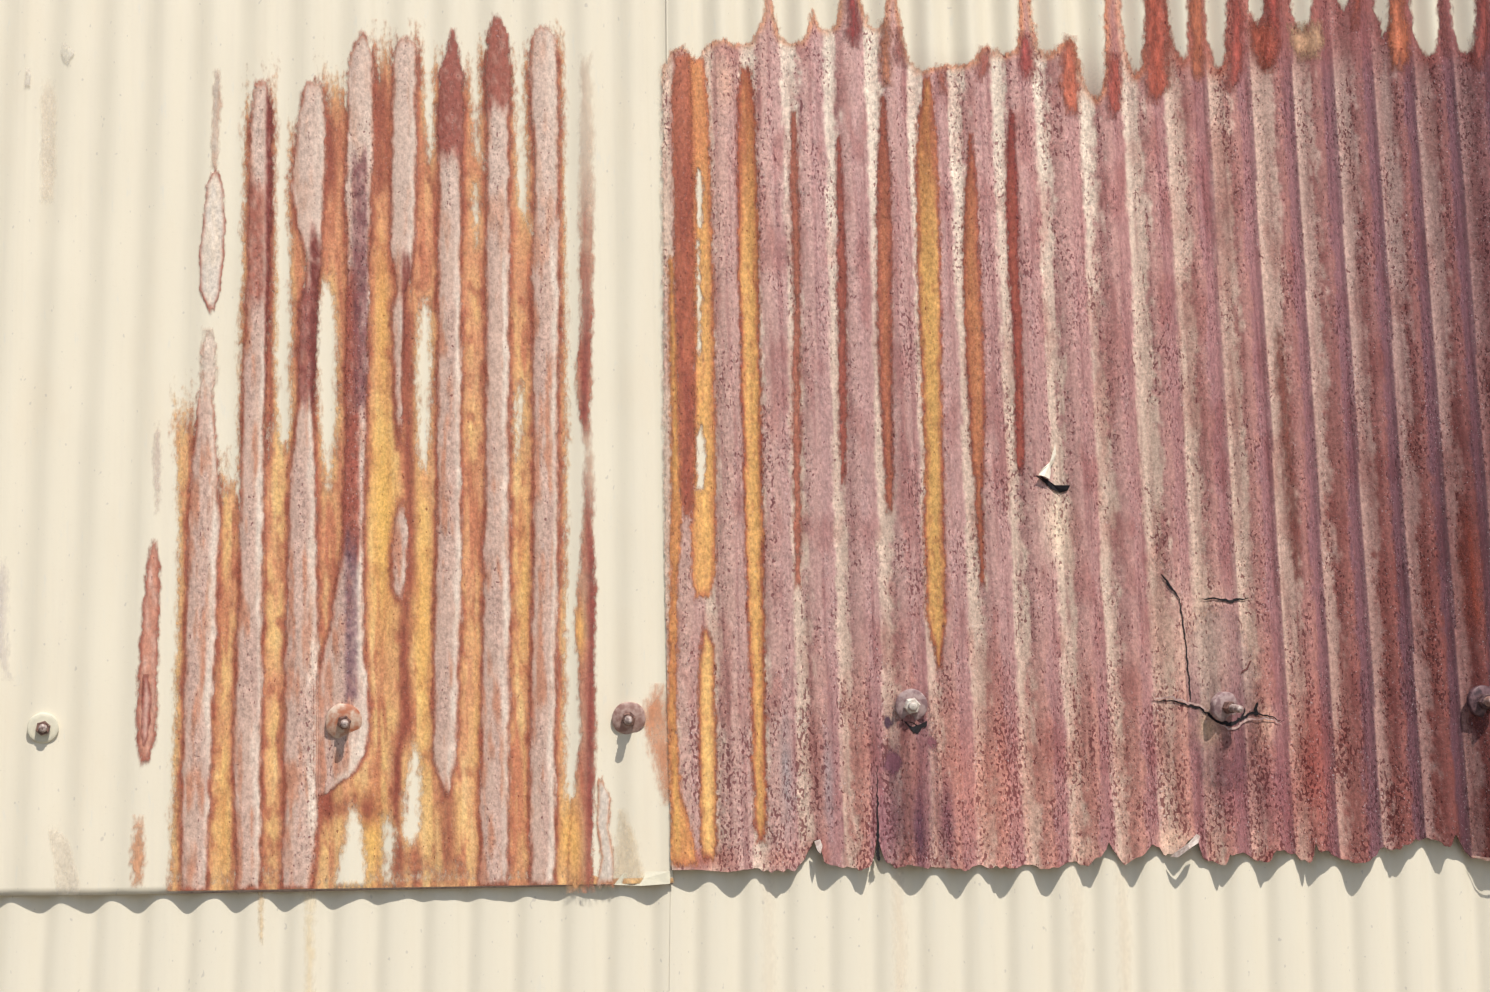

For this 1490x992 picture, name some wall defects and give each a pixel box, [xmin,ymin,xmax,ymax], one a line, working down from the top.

rust [136,16,643,937]
rust [646,0,1490,883]
crack [1152,574,1282,730]